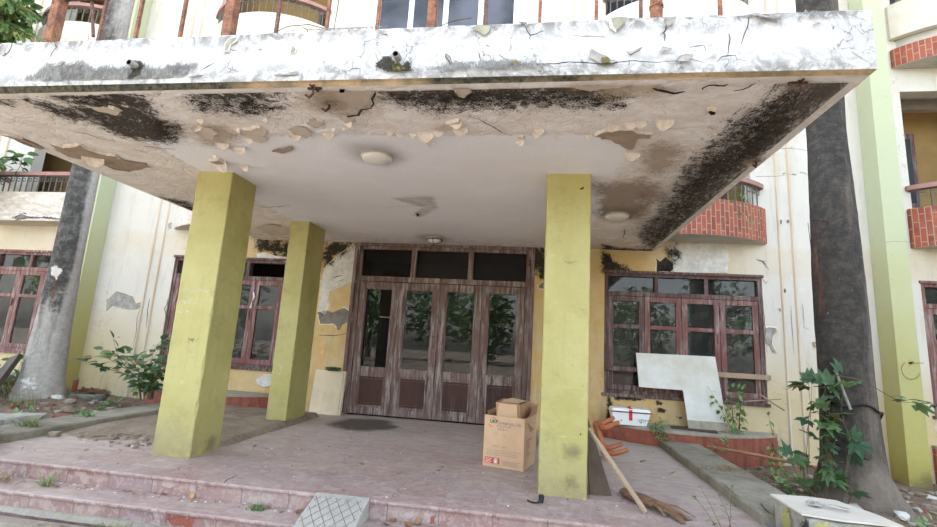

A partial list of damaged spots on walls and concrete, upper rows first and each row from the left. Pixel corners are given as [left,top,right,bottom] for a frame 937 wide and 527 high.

crack [539,18,749,65]
mould [0,94,191,145]
mould [180,92,300,121]
crack [347,91,376,118]
mould [369,86,643,121]
crack [652,84,754,95]
peeling [0,132,149,172]
peeling [193,114,356,173]
peeling [585,120,675,173]
damp [596,81,848,274]
peeling [105,290,142,314]
peeling [317,244,360,330]